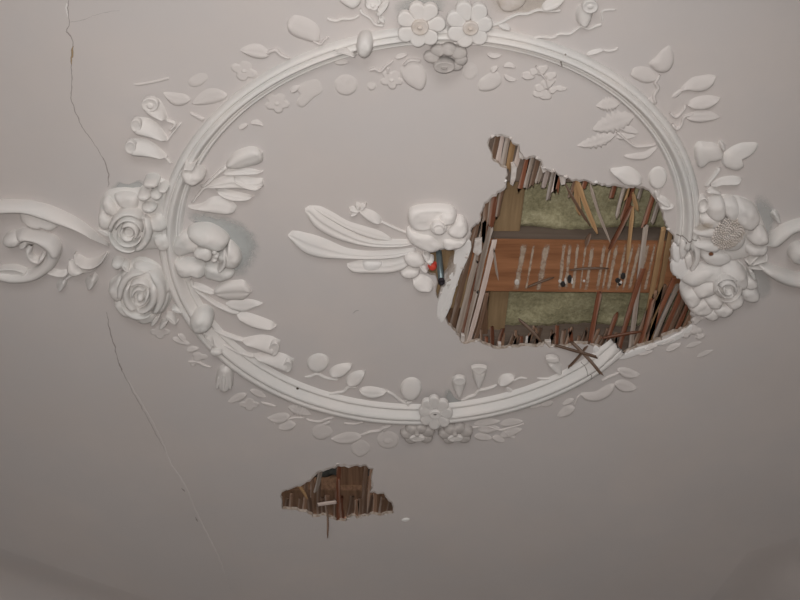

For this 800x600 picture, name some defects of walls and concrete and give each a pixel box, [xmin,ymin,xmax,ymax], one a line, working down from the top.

crack [65,0,109,186]
spalling [427,134,701,360]
spalling [280,463,394,521]